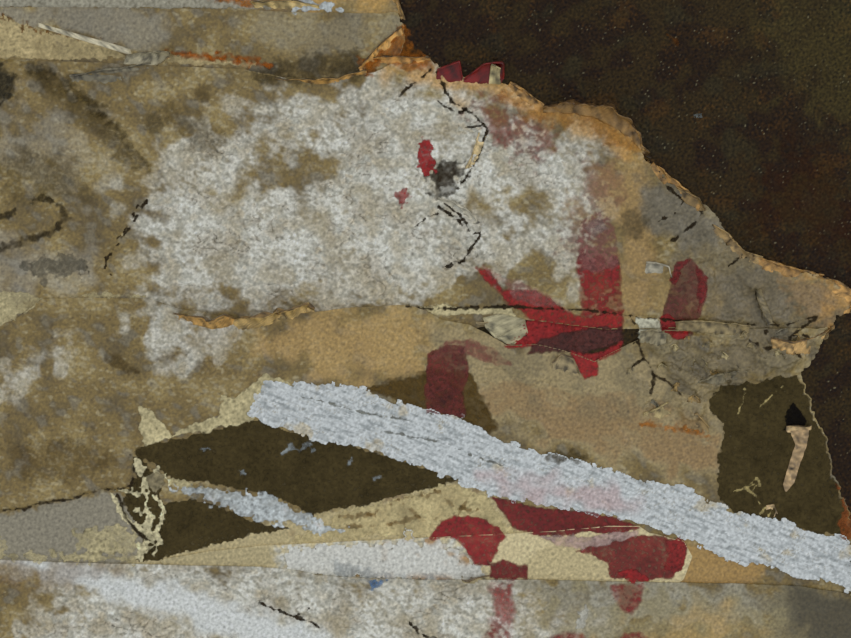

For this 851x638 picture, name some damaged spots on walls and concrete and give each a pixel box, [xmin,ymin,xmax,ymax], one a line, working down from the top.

peeling [0,15,257,84]
peeling [275,0,430,84]
peeling [424,133,486,197]
peeling [436,60,706,211]
peeling [712,224,851,314]
peeling [173,302,315,330]
peeling [419,303,528,345]
peeling [635,317,751,346]
peeling [770,325,835,355]
peeling [0,370,514,566]
peeling [709,375,845,535]
rust [836,484,851,541]